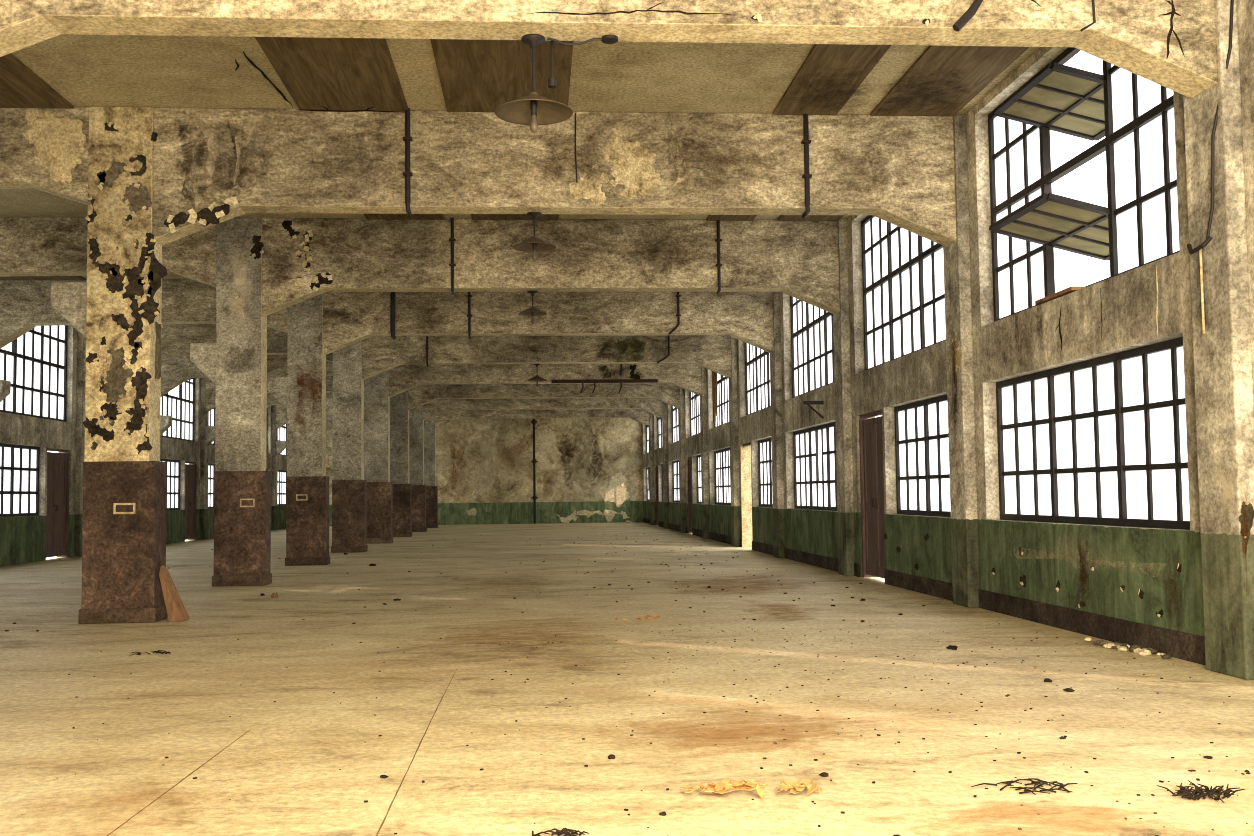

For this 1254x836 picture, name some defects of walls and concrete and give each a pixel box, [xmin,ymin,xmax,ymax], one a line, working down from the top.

peeling [23,110,86,183]
peeling [250,234,264,260]
spalling [282,220,333,291]
peeling [83,154,240,456]
peeling [556,473,630,523]